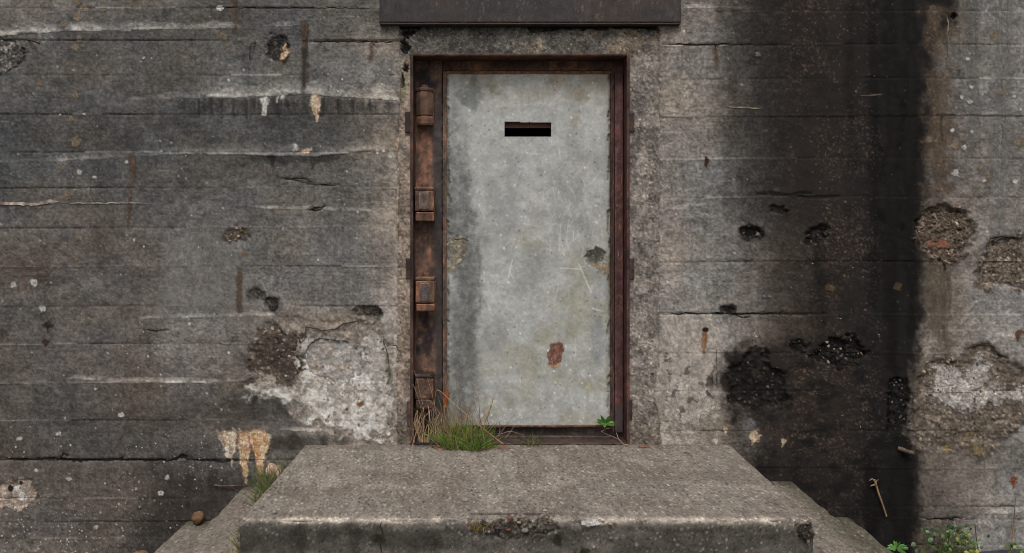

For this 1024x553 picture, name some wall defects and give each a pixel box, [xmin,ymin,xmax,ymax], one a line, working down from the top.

spalling [265,34,289,60]
spalling [587,250,609,274]
spalling [739,225,764,241]
leakage [712,0,980,553]
spalling [914,203,1024,293]
spalling [243,287,398,444]
crack [287,321,396,385]
rust [547,342,564,369]
spalling [788,337,865,369]
spalling [887,339,1024,460]
crack [4,453,239,463]
spalling [0,477,37,512]